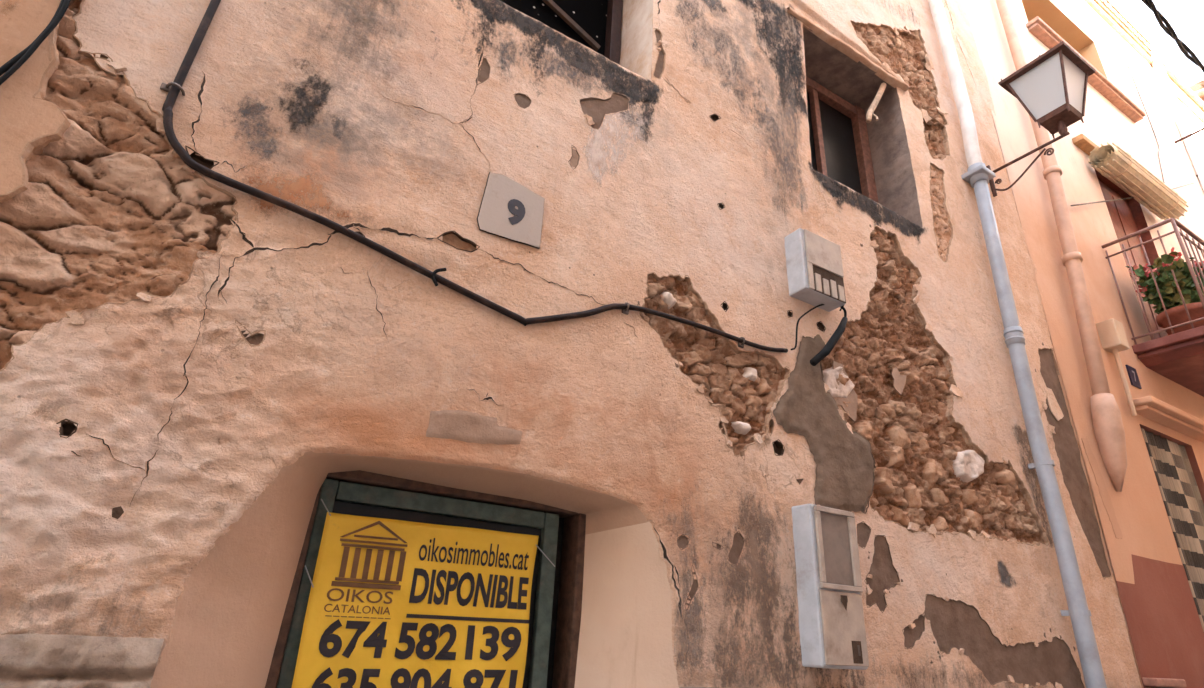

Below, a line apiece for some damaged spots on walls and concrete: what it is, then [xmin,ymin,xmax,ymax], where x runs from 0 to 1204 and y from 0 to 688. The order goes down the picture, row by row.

spalling [0,0,239,371]
leakage [231,61,345,159]
leakage [452,0,660,182]
peeling [580,92,630,130]
leakage [678,0,808,212]
spalling [851,20,953,262]
crack [70,219,439,506]
spalling [638,272,791,461]
spalling [821,225,1050,613]
peeling [902,594,1085,688]